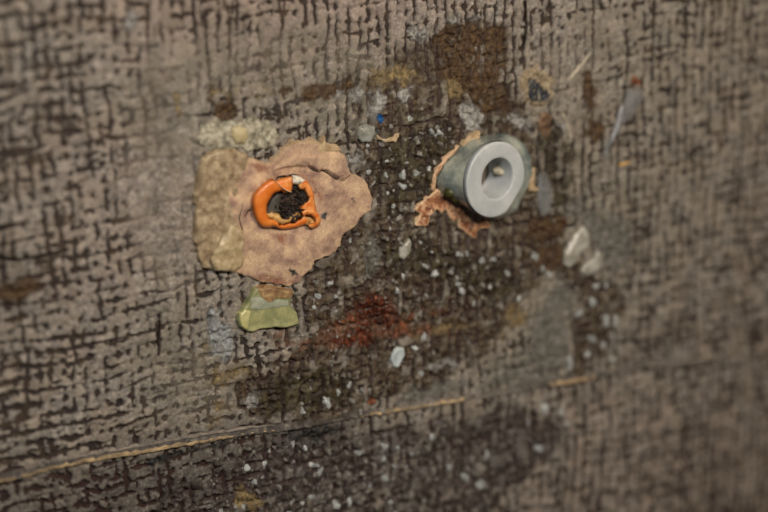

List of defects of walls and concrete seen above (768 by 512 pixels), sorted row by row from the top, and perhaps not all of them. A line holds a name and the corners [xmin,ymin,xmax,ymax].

peeling [414,145,491,239]
crack [0,220,27,228]
crack [0,248,66,262]
leakage [146,14,624,512]
rust [317,293,431,348]